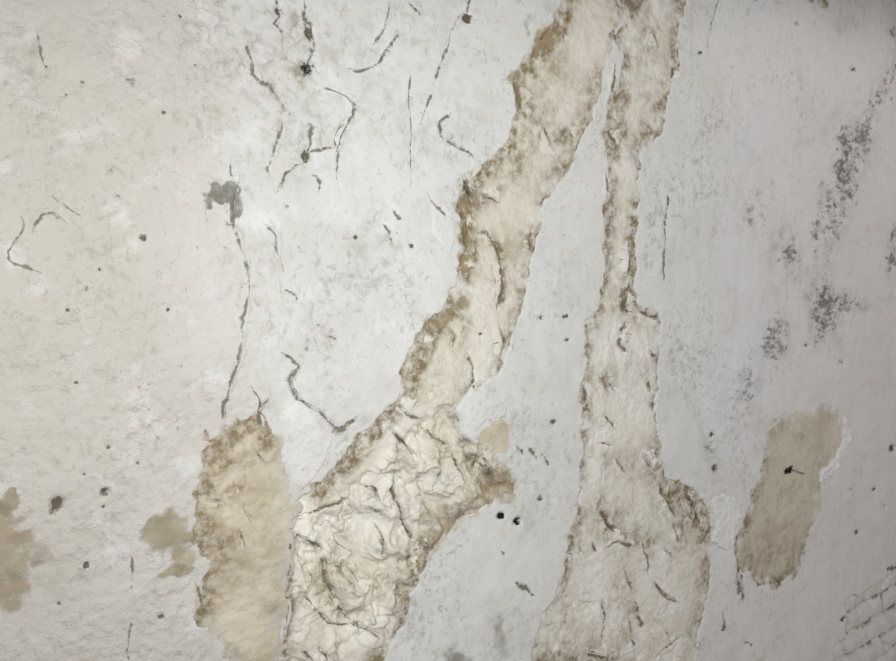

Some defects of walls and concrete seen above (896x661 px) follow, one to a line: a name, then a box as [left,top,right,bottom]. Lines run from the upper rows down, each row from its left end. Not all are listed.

crack [244,0,356,194]
crack [408,0,477,170]
leakage [811,64,896,252]
crack [7,188,79,273]
crack [222,164,297,427]
crack [280,351,355,433]
spalling [191,0,853,661]
leakage [762,319,788,359]
leakage [812,285,858,347]
leakage [0,488,32,610]
leakage [143,509,194,577]
flaking render [832,570,896,661]